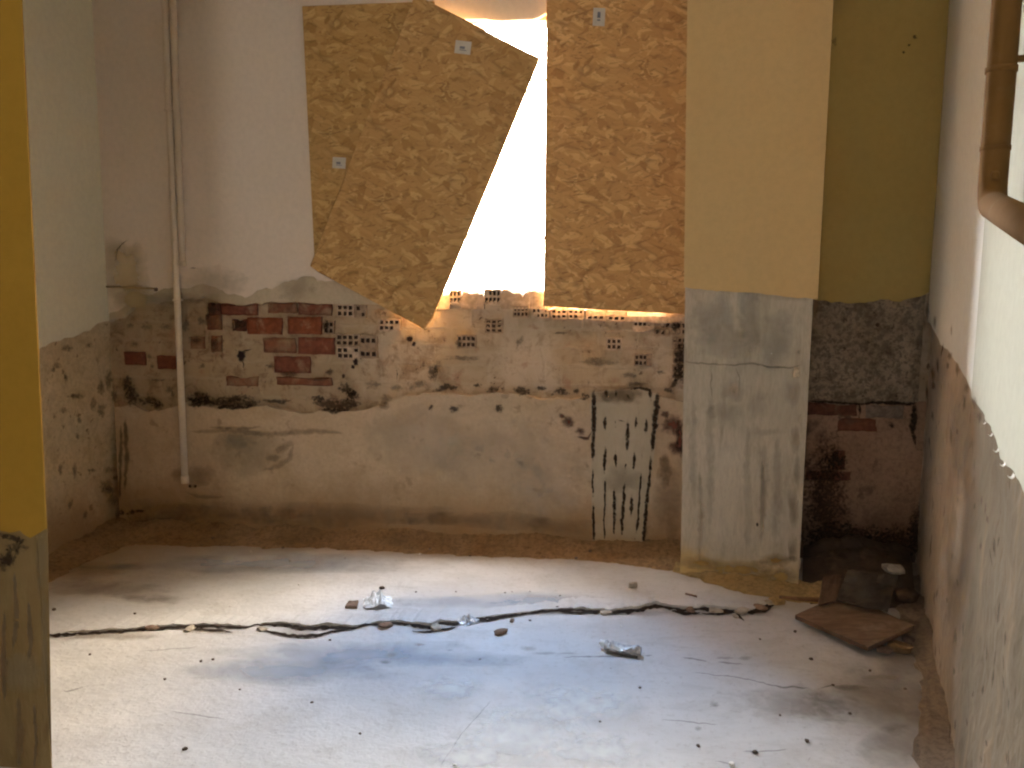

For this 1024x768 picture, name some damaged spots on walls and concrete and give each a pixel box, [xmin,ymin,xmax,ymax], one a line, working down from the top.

peeling [427,0,546,20]
peeling [684,0,1024,570]
flaking render [456,306,685,385]
leakage [73,372,163,415]
peeling [0,0,416,768]
leakage [188,392,286,410]
leakage [312,383,361,414]
leakage [428,366,457,392]
leakage [514,386,634,401]
crack [50,590,774,638]